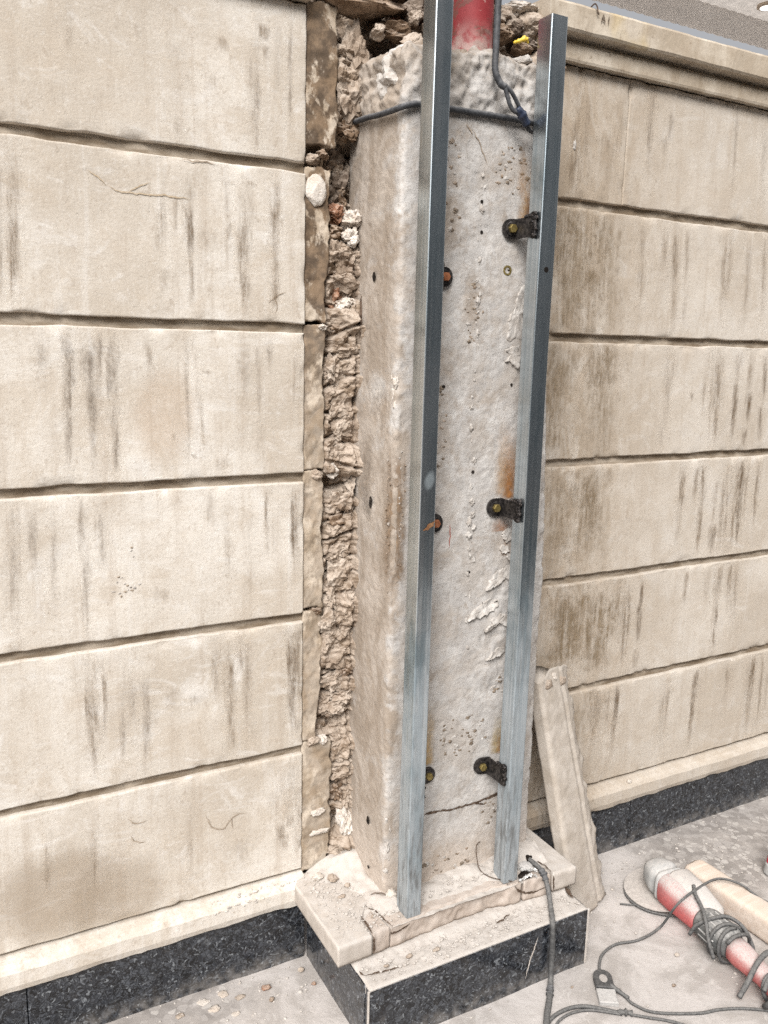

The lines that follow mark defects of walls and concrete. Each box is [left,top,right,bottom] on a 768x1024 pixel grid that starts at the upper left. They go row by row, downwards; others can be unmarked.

crack [89,171,187,199]
spalling [300,1,373,873]
corrosion [504,465,513,497]
spalling [467,527,512,633]
water stain [556,597,617,659]
crack [424,793,498,815]